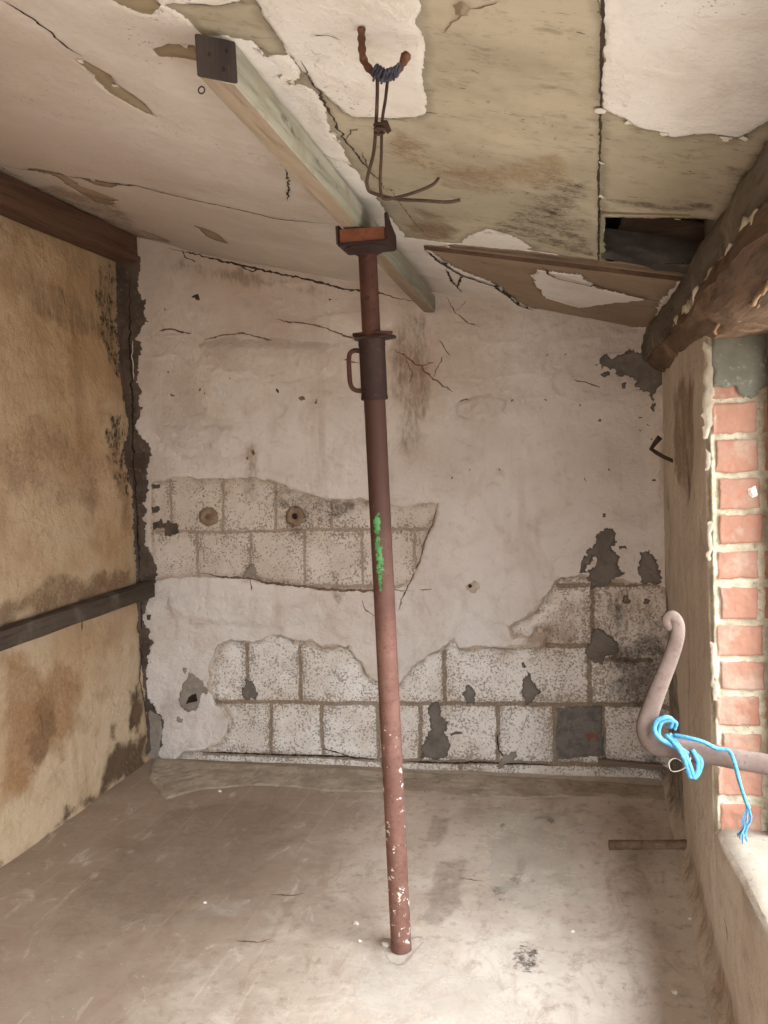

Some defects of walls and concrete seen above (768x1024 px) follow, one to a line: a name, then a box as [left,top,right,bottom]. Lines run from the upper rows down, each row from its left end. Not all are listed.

crack [7,3,80,55]
peeling [113,0,768,328]
crack [170,248,414,302]
crack [396,340,453,392]
water stain [105,416,129,494]
flaking render [114,308,373,592]
flaking render [390,502,439,588]
water stain [85,693,146,805]
peeling [136,601,151,757]
flaking render [177,635,382,767]
flaking render [399,574,669,781]